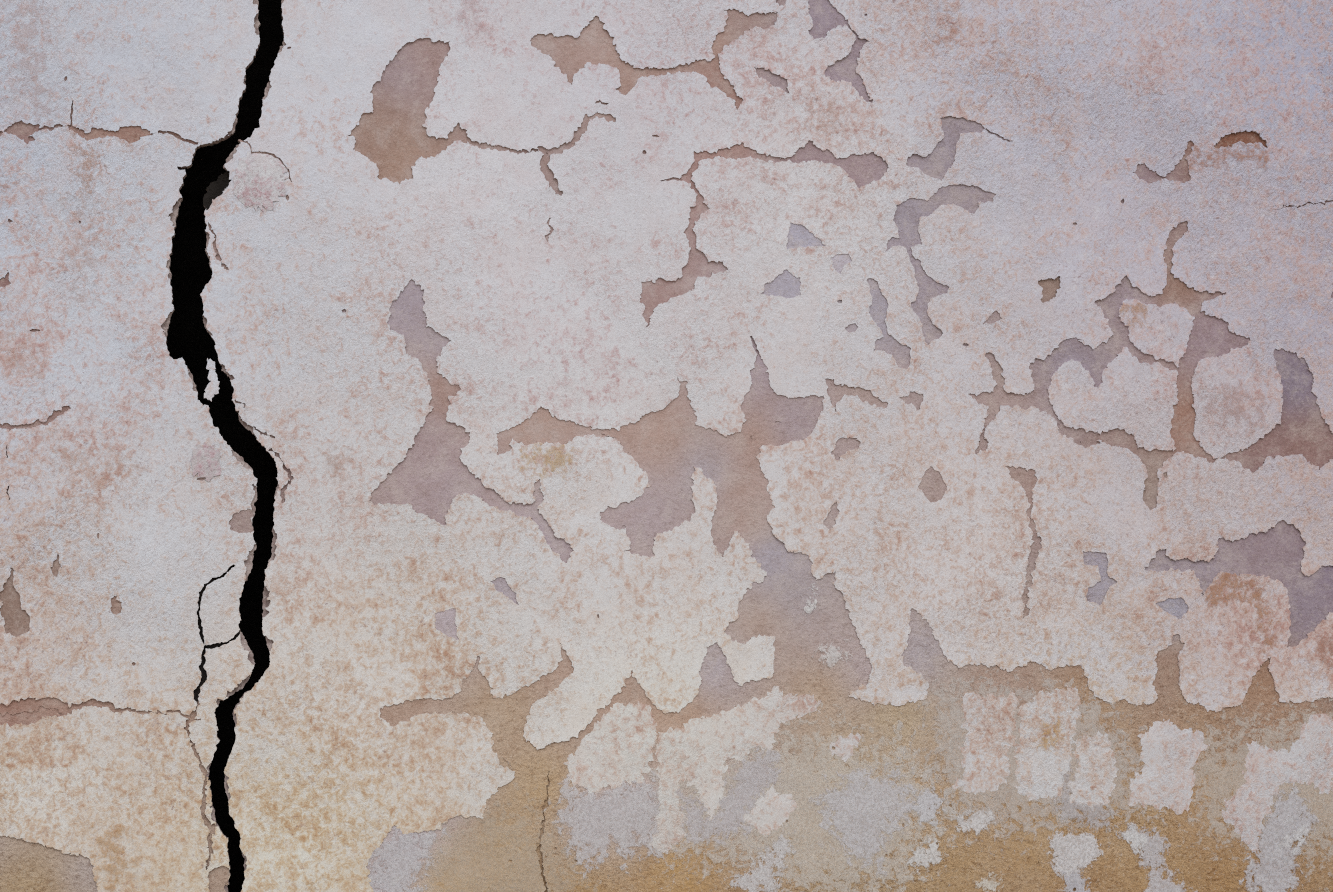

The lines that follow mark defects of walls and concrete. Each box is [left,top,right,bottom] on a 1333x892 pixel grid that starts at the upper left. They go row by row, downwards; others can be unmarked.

crack [0,0,294,892]
peeling [369,279,574,563]
peeling [348,38,616,196]
peeling [530,0,790,109]
peeling [640,140,889,327]
peeling [808,0,873,103]
peeling [867,278,911,369]
peeling [885,116,1013,345]
peeling [969,221,1333,510]
peeling [1133,140,1194,184]
peeling [366,336,1333,892]